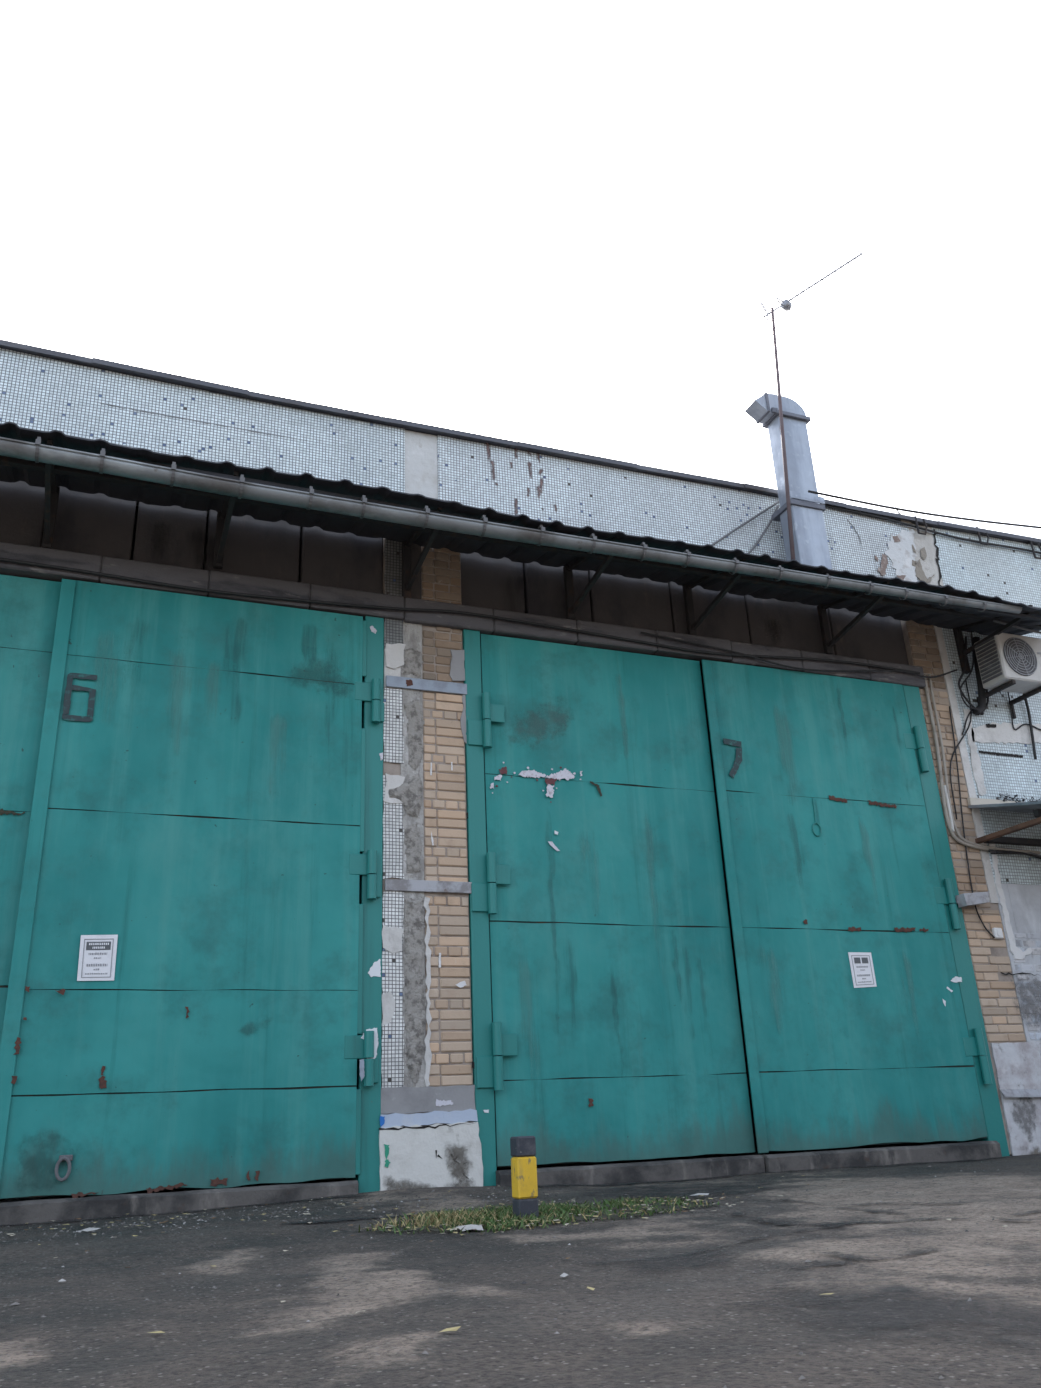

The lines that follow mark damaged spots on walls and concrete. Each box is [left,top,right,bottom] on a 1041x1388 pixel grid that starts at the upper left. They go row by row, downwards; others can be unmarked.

rust [486,443,557,515]
peeling [875,510,934,583]
spalling [402,648,423,677]
spalling [388,699,425,874]
peeling [490,762,602,803]
peeling [368,959,381,977]
spalling [403,898,427,1087]